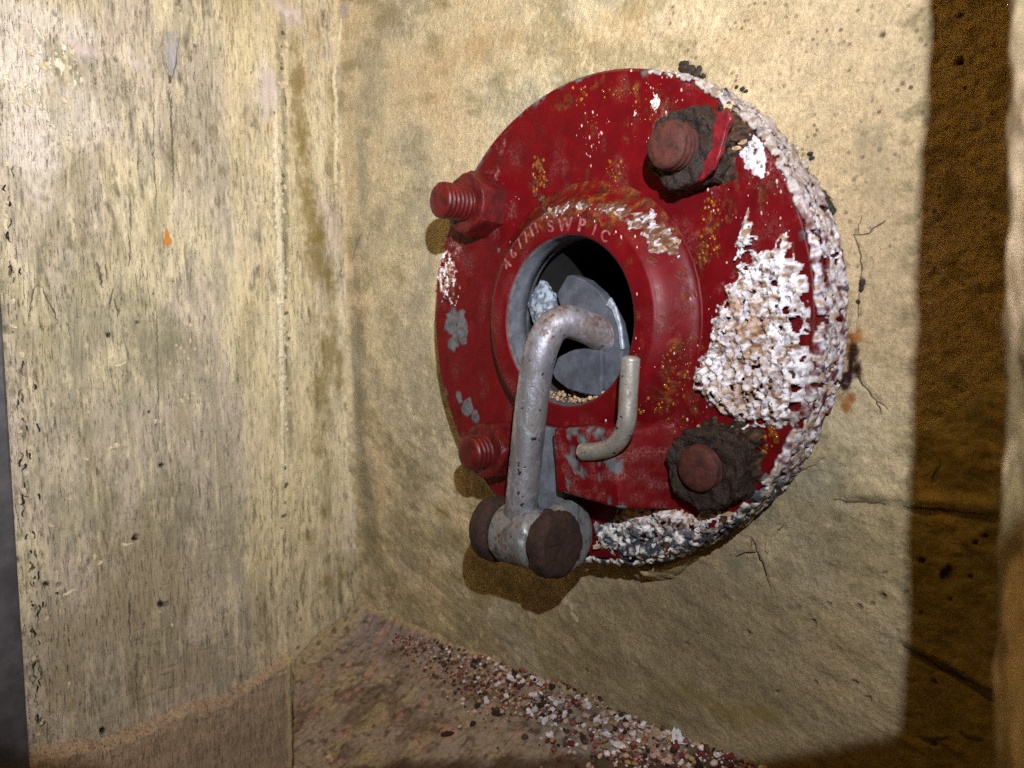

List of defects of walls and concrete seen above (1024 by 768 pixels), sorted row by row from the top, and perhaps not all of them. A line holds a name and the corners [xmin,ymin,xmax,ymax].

crack [851,215,886,325]
crack [856,374,889,414]